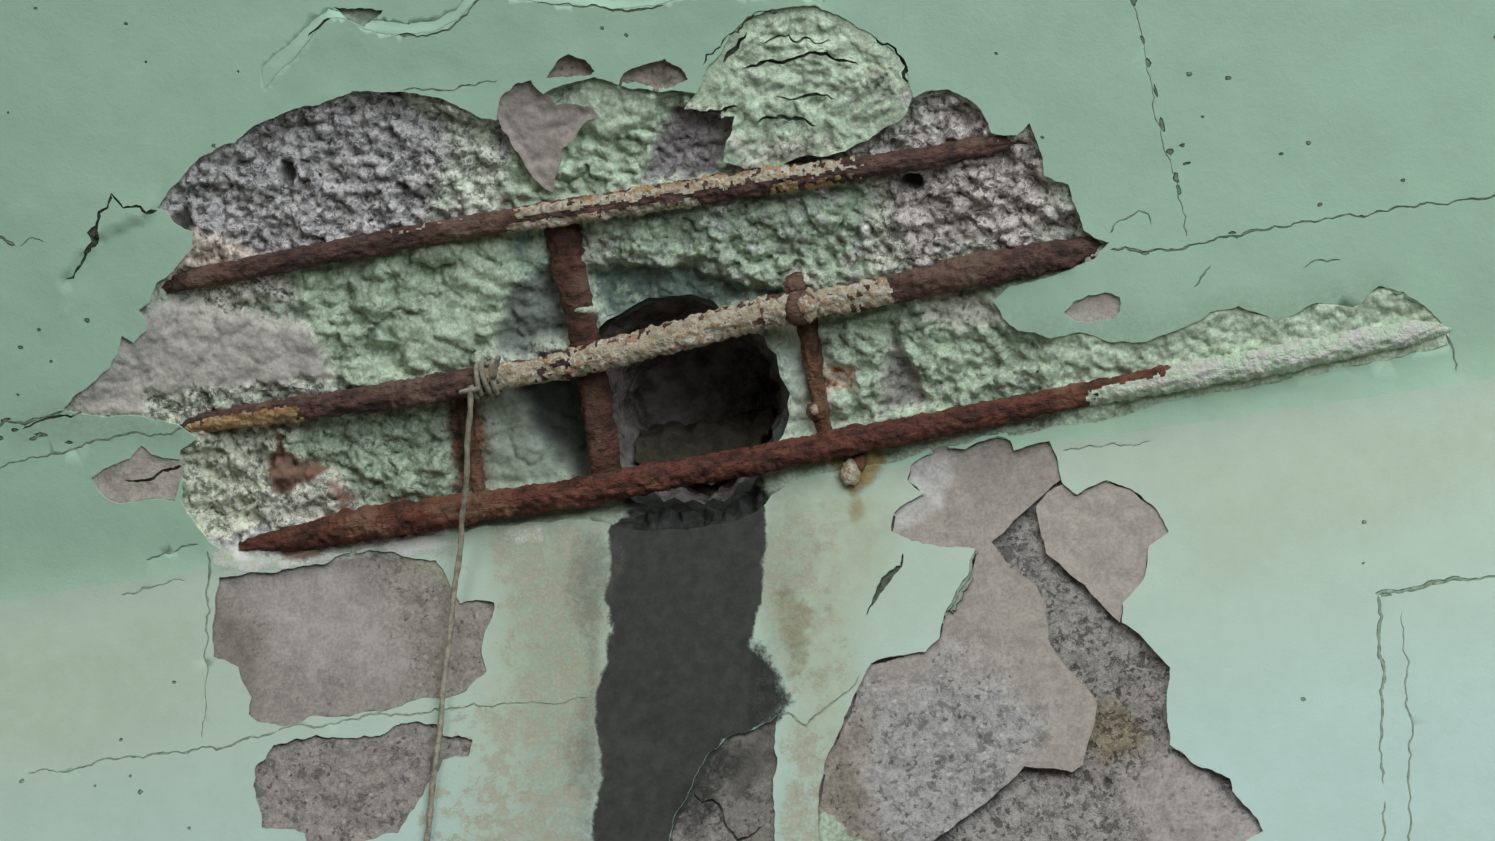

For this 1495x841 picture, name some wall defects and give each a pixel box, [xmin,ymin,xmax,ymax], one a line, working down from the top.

crack [1110,0,1495,287]
crack [67,193,157,279]
spalling [64,54,1109,559]
crack [0,410,183,469]
corrosion [269,426,355,504]
efflorescence [212,536,451,573]
peeling [213,550,495,726]
peeling [253,722,472,841]
damp [592,486,790,841]
corrosion [831,449,884,490]
peeling [464,268,1452,841]
crack [1375,575,1495,841]